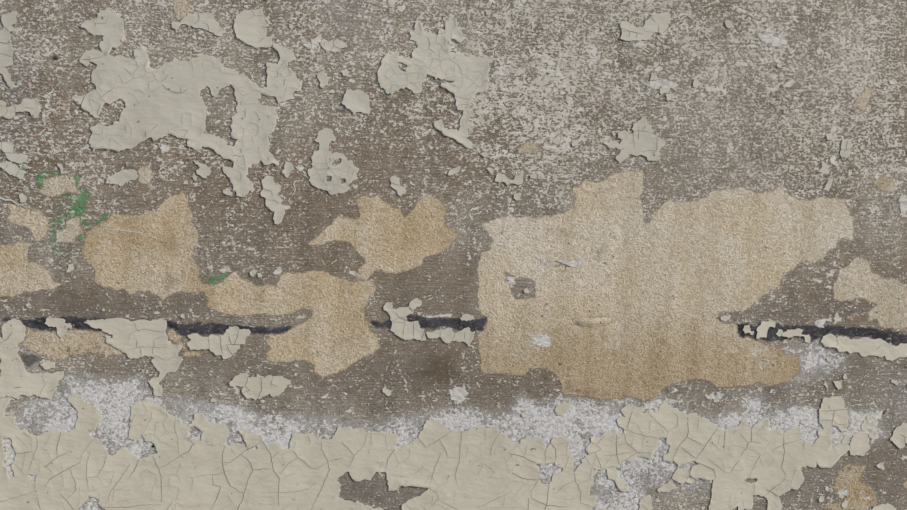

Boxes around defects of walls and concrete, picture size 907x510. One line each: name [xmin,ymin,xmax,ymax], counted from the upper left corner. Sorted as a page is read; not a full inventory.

peeling [74,0,302,225]
water stain [22,355,40,366]
peeling [0,116,907,510]
water stain [737,323,907,380]
water stain [12,374,867,468]
water stain [591,438,712,510]